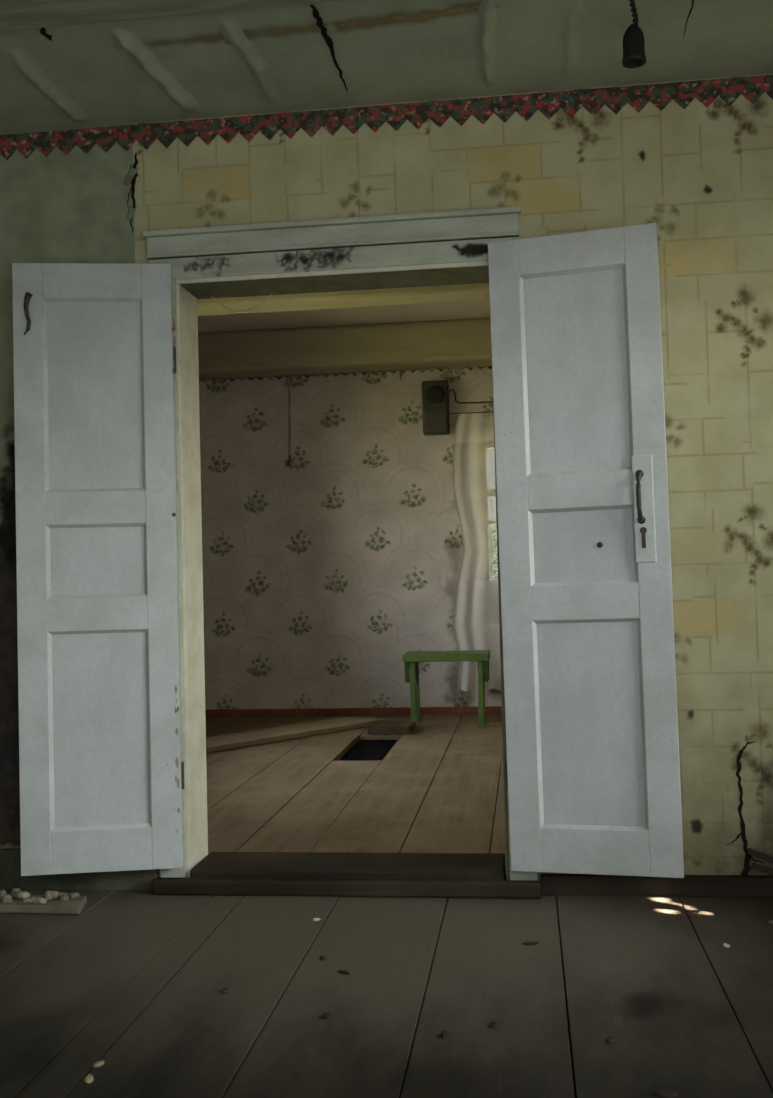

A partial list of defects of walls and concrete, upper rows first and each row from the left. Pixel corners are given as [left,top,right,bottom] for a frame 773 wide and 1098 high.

crack [309,5,348,91]
peeling [0,739,19,773]
crack [726,741,763,875]